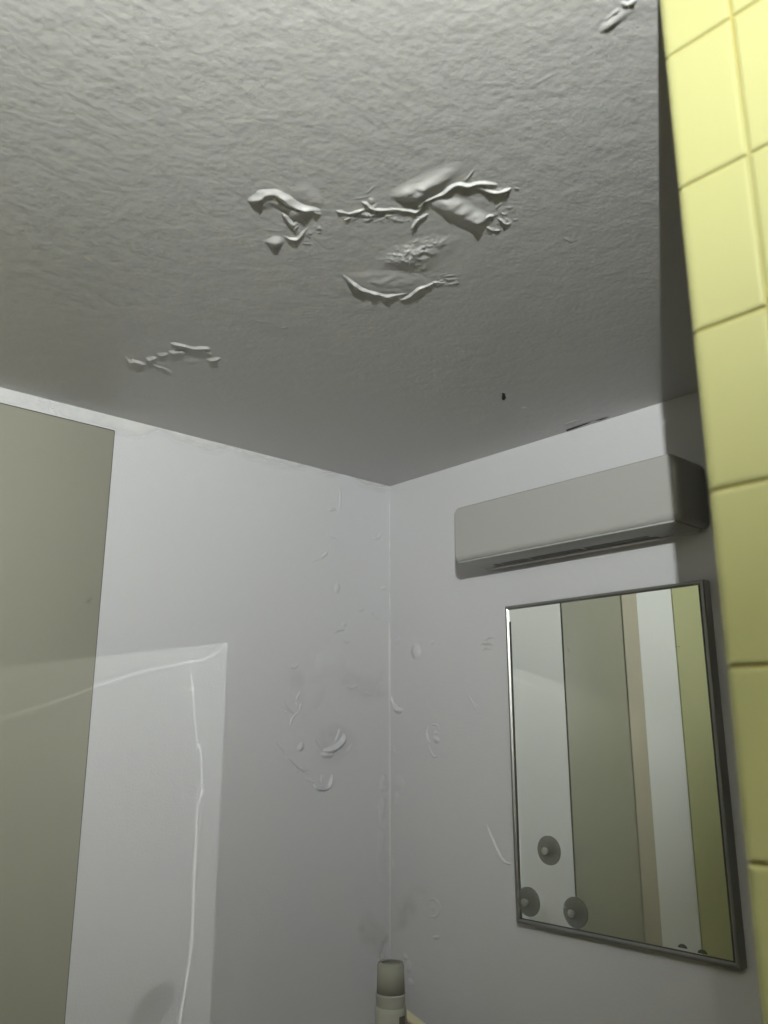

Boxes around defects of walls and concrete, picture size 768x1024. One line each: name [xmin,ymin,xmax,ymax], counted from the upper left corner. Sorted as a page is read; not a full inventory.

peeling [585,0,640,56]
peeling [336,161,520,300]
peeling [124,342,221,374]